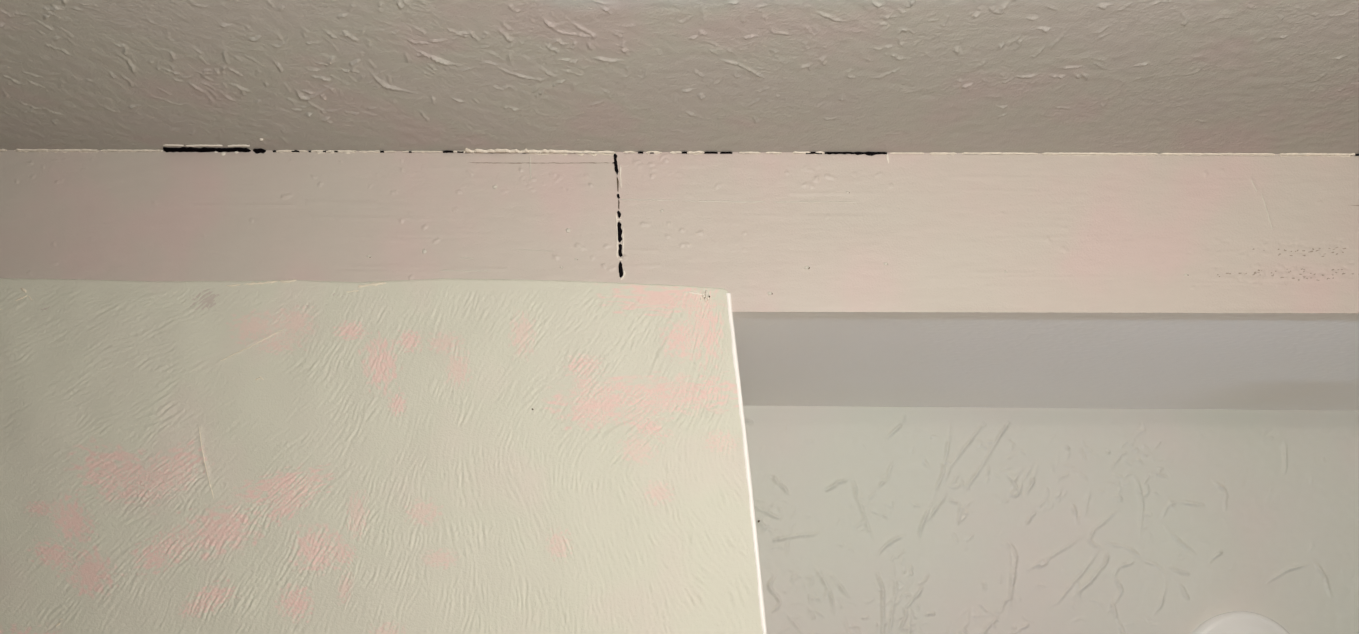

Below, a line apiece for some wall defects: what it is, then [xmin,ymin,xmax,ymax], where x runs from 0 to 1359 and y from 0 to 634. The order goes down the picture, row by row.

crack [380,147,464,155]
crack [806,150,887,158]
crack [613,151,732,280]